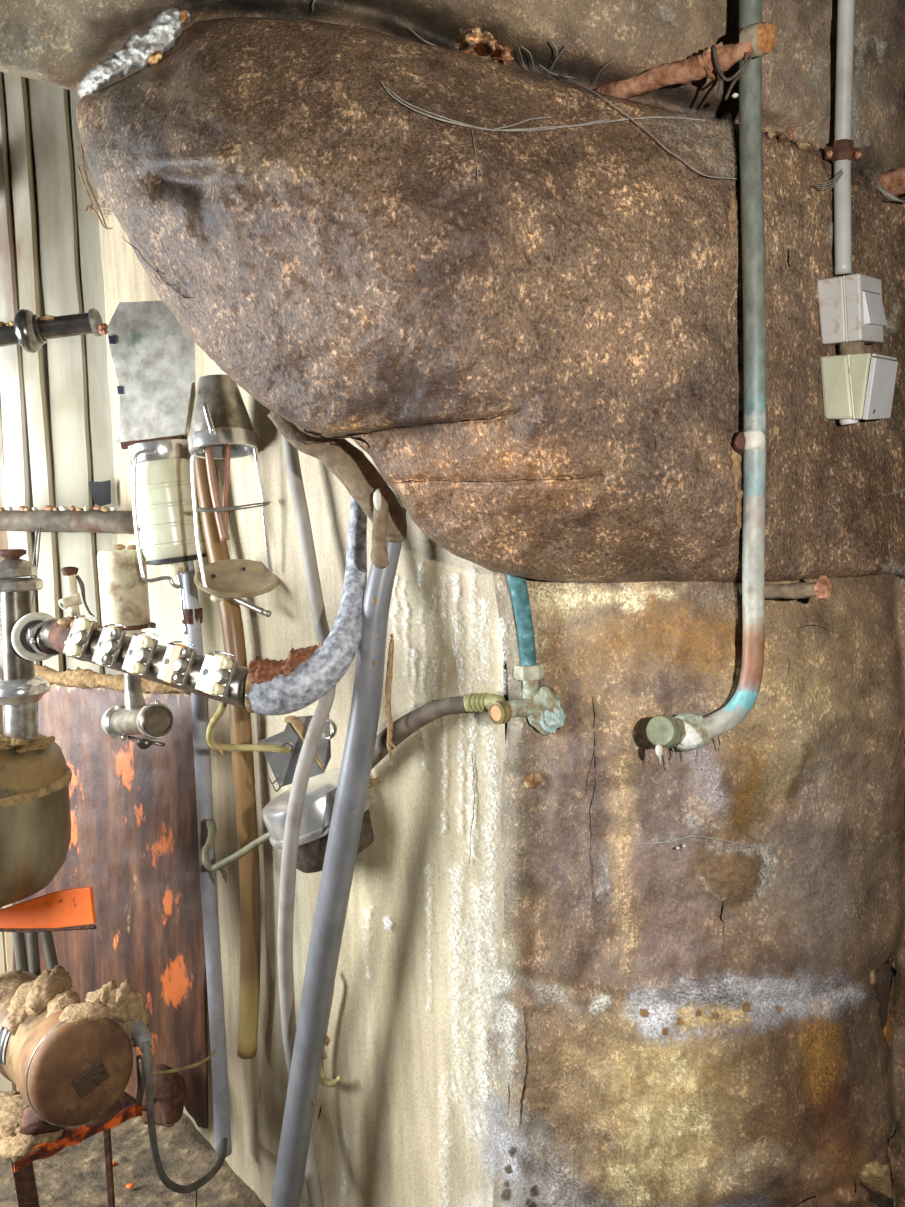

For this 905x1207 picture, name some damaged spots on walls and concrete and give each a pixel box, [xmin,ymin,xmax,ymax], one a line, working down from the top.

leakage [390,562,506,707]
leakage [420,679,864,1207]
crack [885,960,896,1013]
crack [887,1122,899,1207]